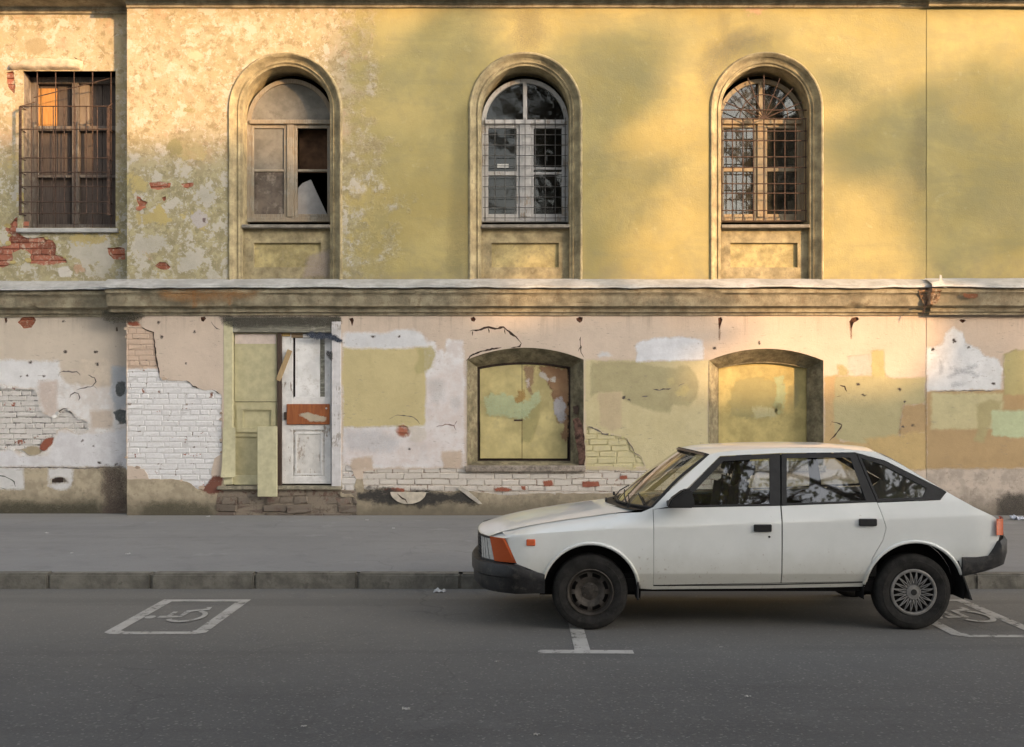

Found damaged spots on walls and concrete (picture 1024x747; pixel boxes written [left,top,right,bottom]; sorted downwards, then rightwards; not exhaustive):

flaking render [0,217,203,278]
crack [466,326,521,361]
flaking render [0,361,95,456]
crack [58,371,96,413]
flaking render [113,320,726,516]